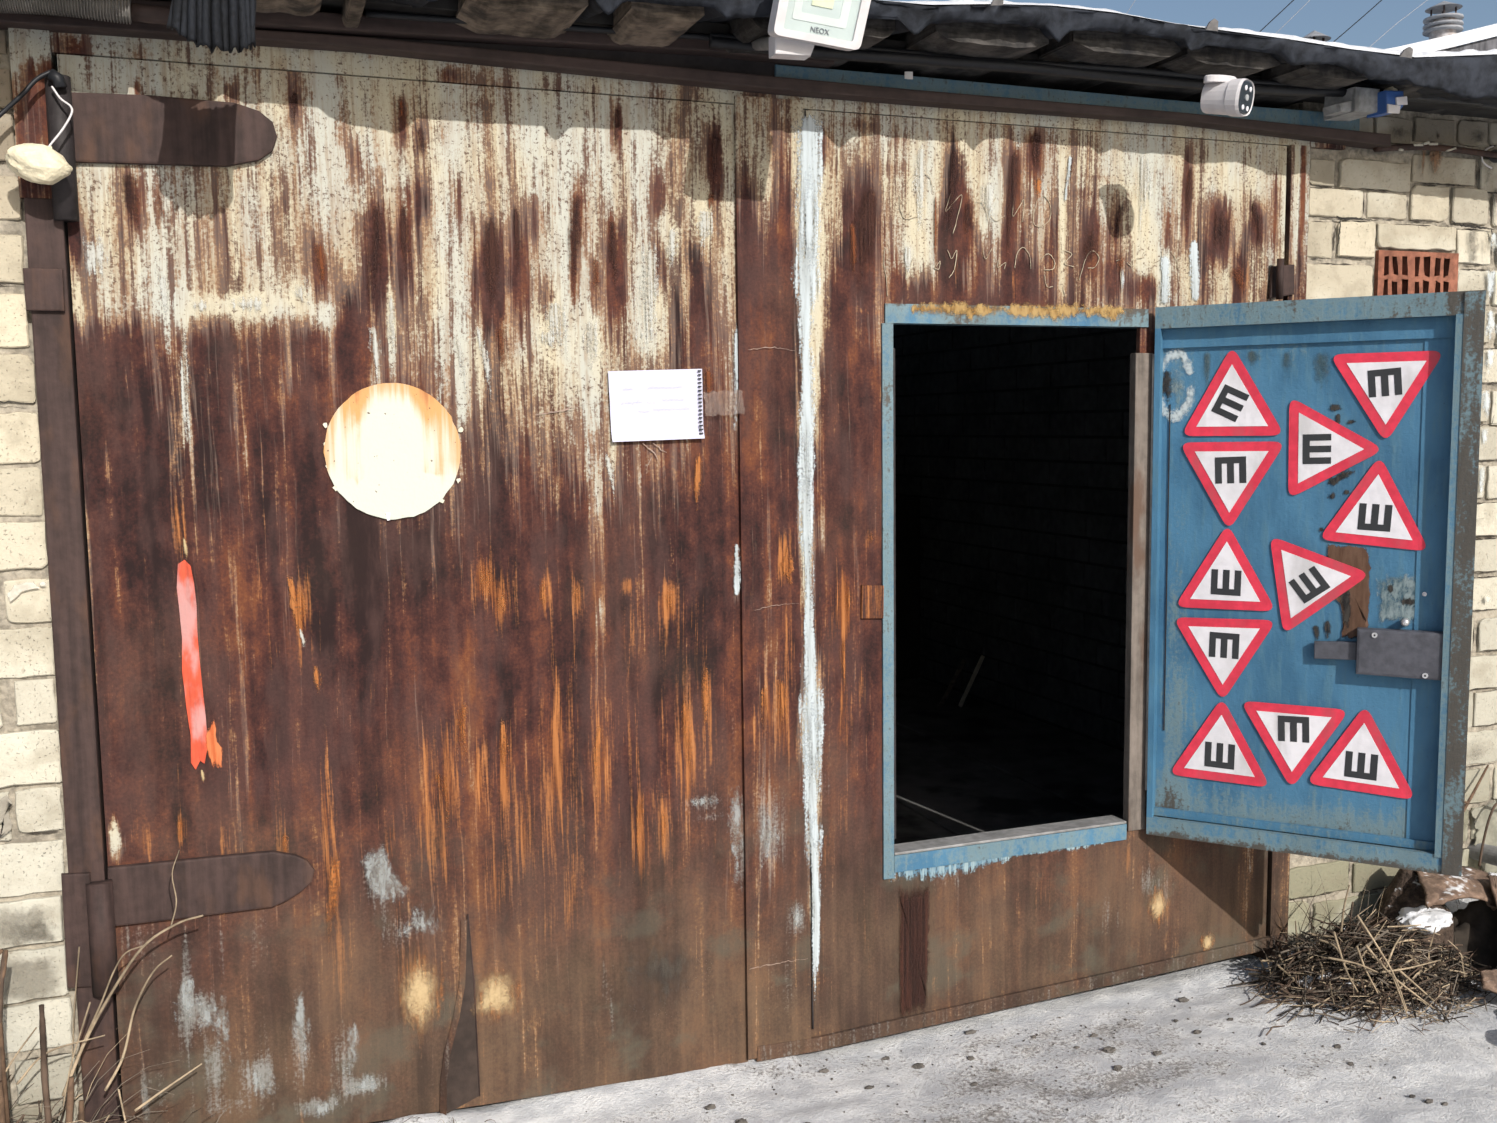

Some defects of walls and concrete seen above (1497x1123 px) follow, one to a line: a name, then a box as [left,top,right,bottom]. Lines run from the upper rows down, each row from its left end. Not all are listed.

rust [123,174,138,220]
rust [483,207,521,302]
rust [568,196,618,284]
rust [850,191,877,276]
rust [934,152,973,254]
rust [1007,133,1041,247]
rust [1186,168,1194,220]
rust [912,302,1124,321]
rust [288,578,305,644]
rust [683,671,710,768]
peeling [400,965,440,1027]
peeling [480,972,521,1012]